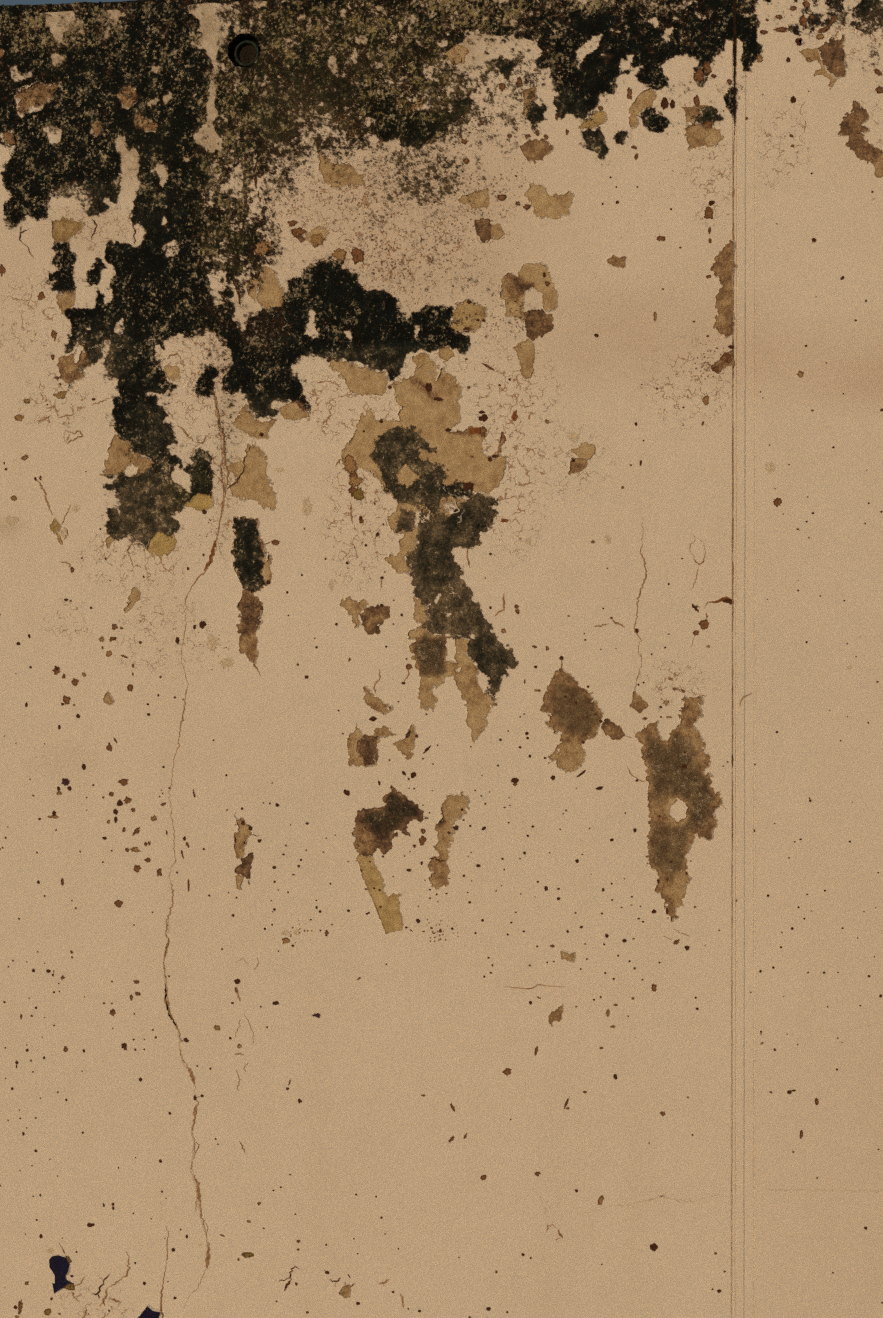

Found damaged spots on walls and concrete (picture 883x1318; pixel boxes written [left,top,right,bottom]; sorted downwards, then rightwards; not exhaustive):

water stain [0,0,883,549]
peeling [456,182,575,243]
peeling [499,77,554,165]
peeling [555,106,608,135]
peeling [704,200,737,374]
peeling [837,100,883,177]
peeling [185,398,309,668]
peeling [326,261,559,743]
crack [160,337,229,1318]
peeling [233,817,262,890]
peeling [347,685,470,934]
peeling [539,667,723,923]